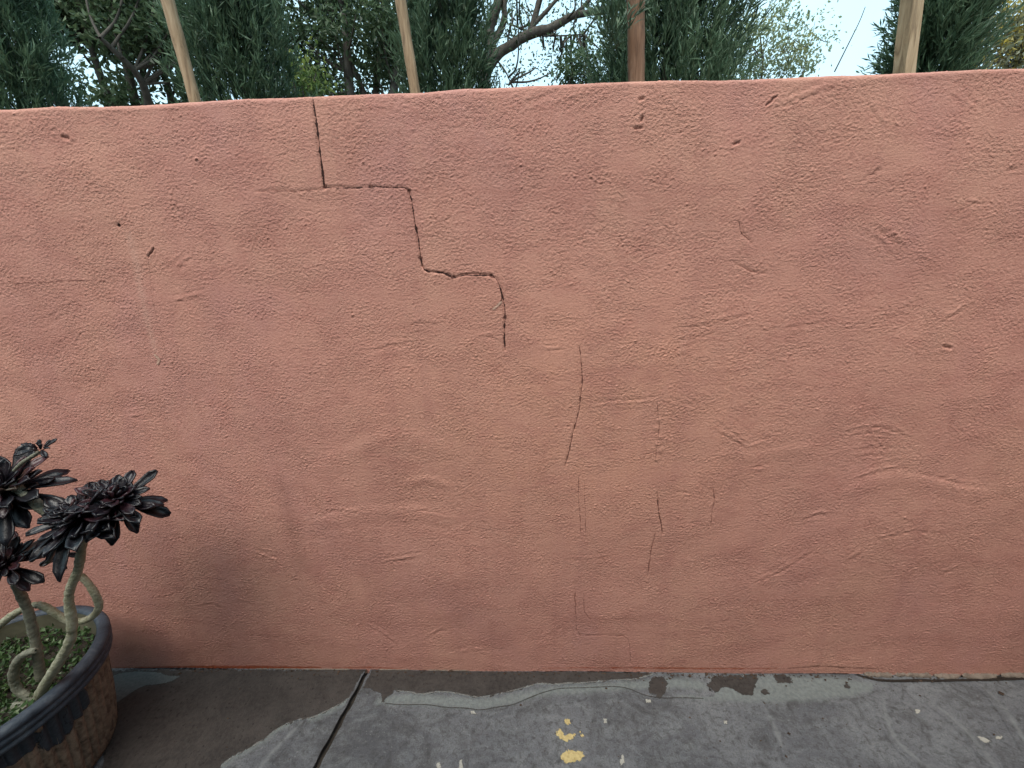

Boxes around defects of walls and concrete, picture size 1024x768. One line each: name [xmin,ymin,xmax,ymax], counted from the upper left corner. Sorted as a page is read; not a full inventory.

crack [313,102,507,350]
crack [565,347,583,464]